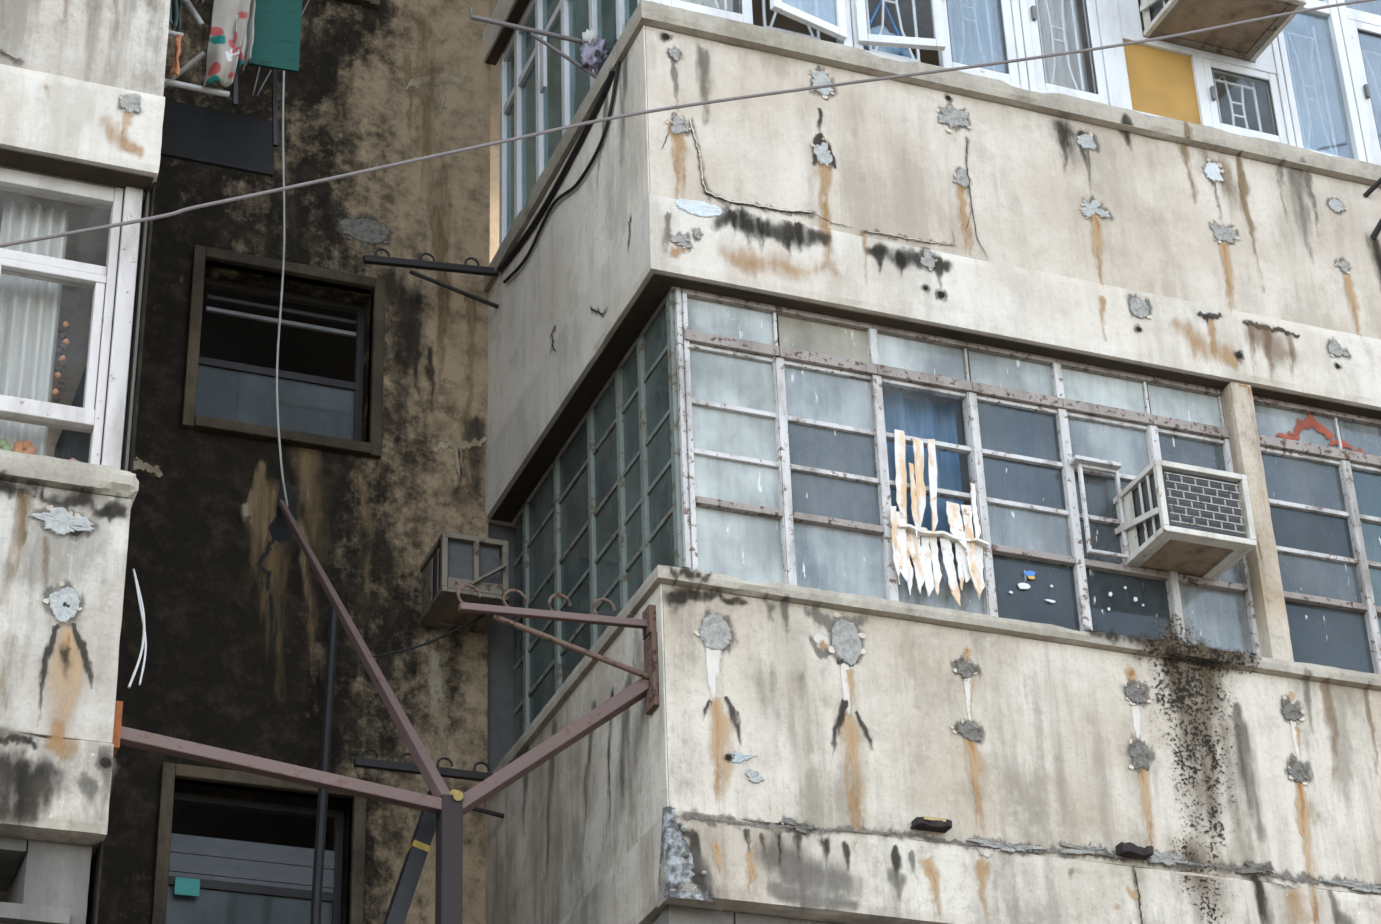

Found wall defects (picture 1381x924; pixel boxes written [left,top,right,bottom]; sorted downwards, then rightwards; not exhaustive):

crack [0,49,23,63]
damp [715,208,831,251]
crack [663,117,987,255]
damp [867,243,950,278]
corrosion [1219,242,1232,288]
spalling [30,505,95,536]
spalling [42,581,83,626]
corrosion [48,629,81,750]
damp [0,727,60,822]
corrosion [711,699,730,791]
damp [1084,617,1261,924]
spalling [657,806,714,908]